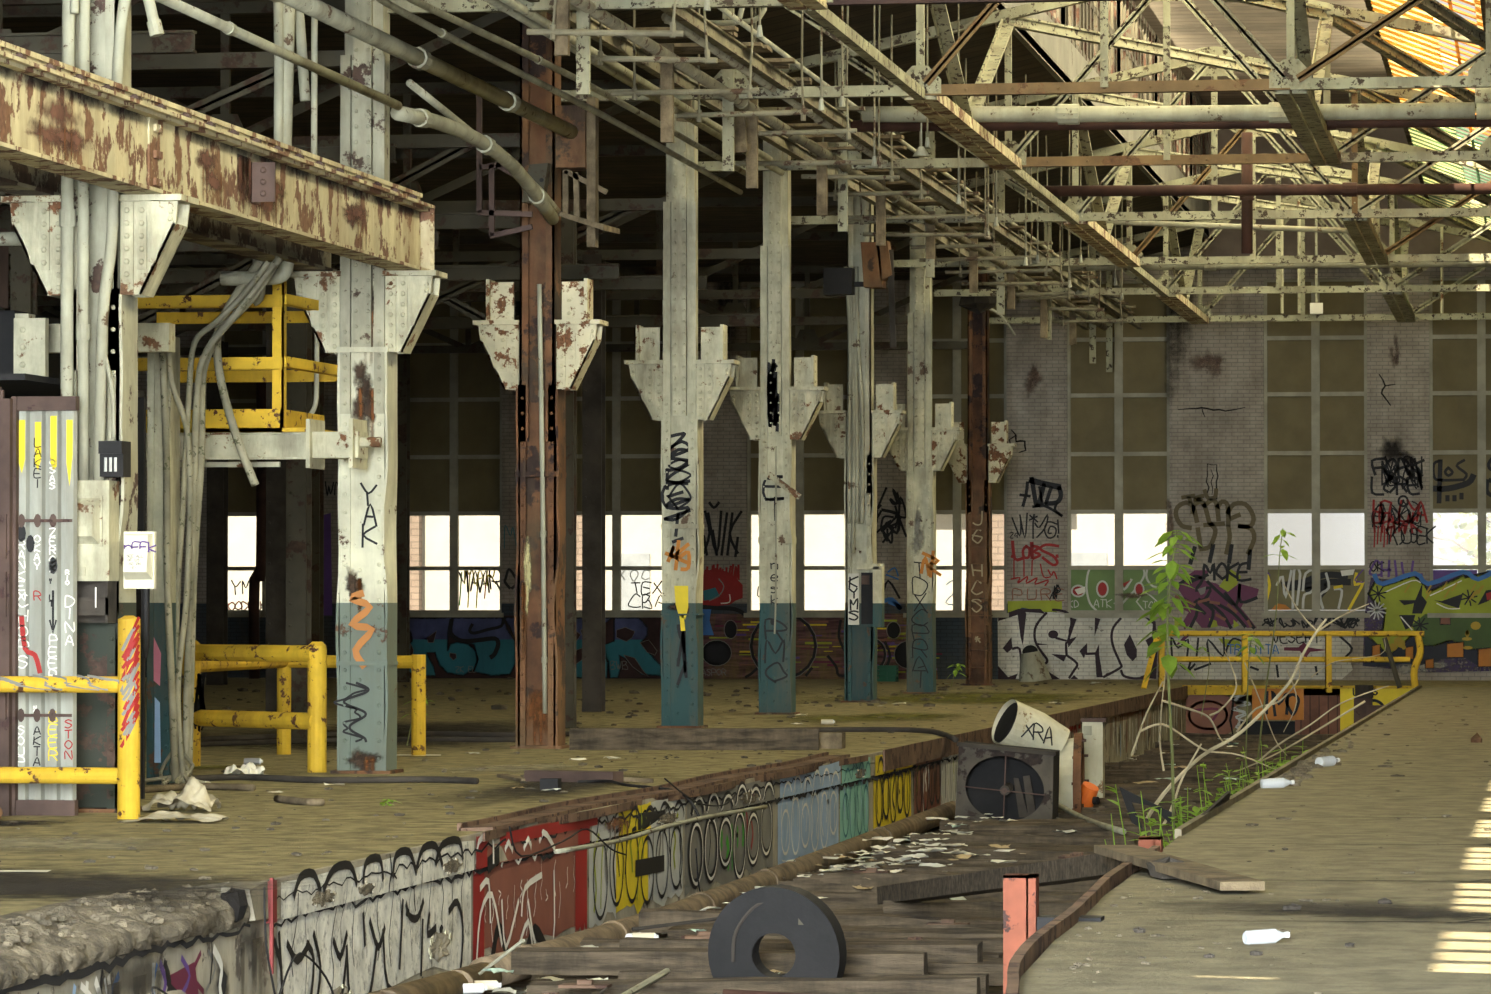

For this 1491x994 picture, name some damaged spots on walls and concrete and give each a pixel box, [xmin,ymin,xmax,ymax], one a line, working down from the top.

rust [238,155,252,198]